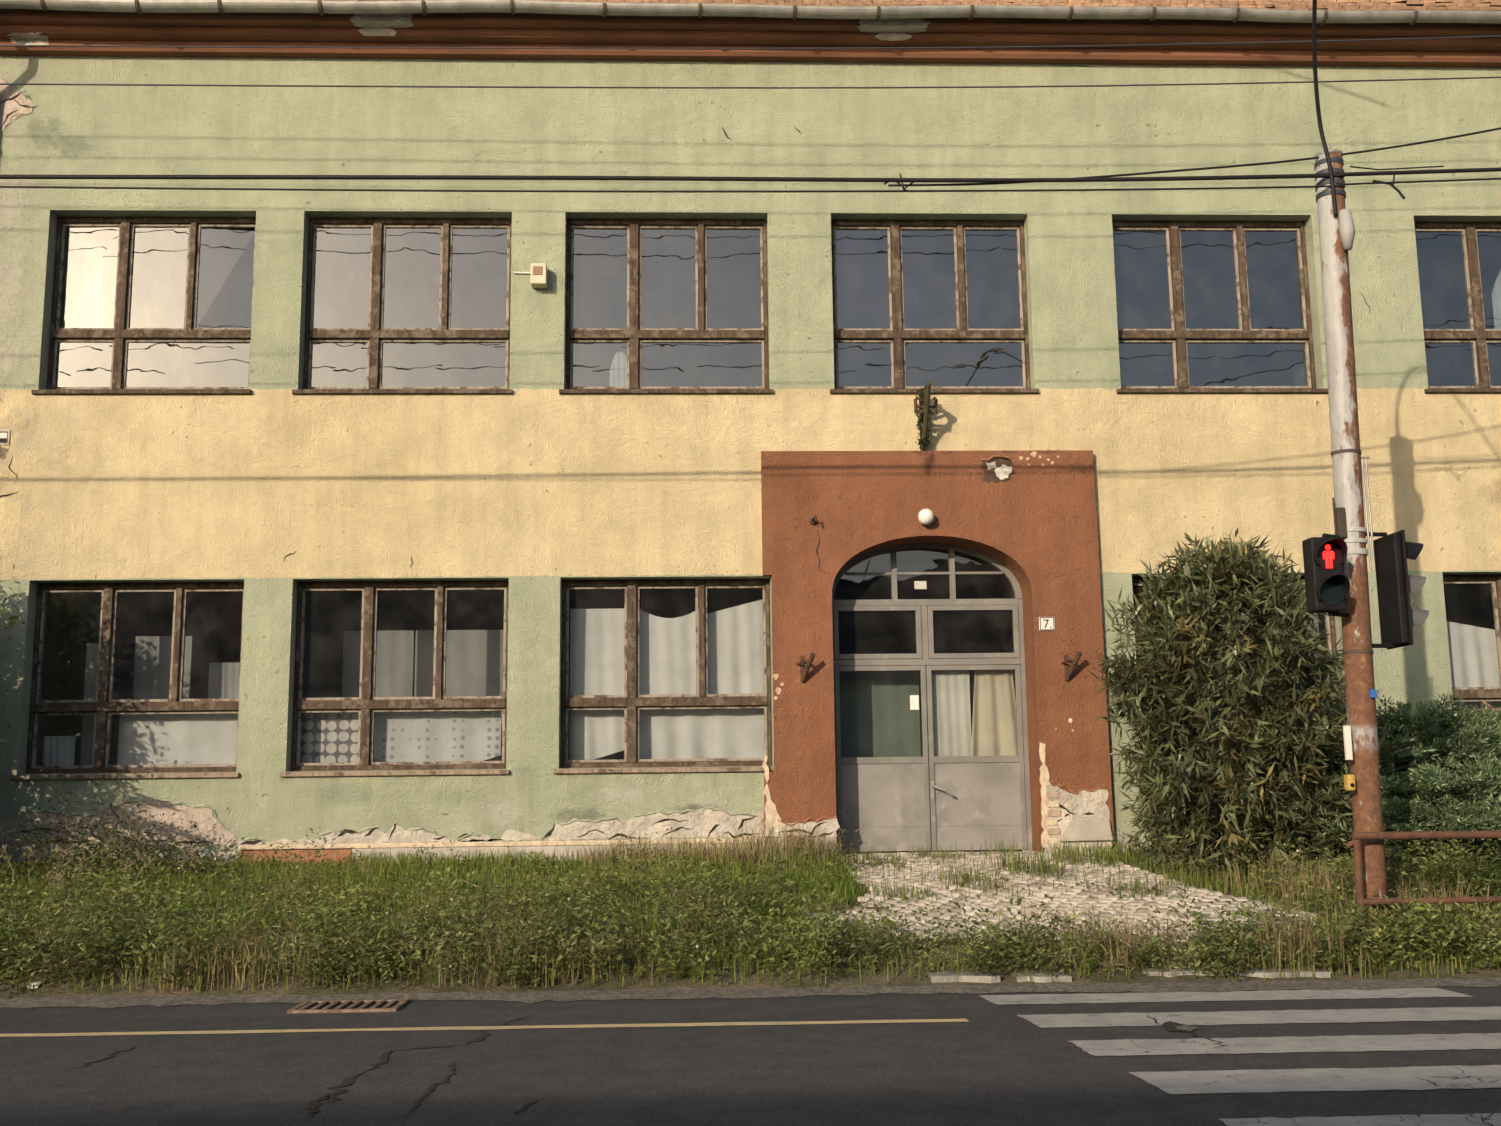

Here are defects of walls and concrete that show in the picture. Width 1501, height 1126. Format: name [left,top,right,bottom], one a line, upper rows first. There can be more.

spalling [0,754,840,854]
spalling [1039,742,1115,850]